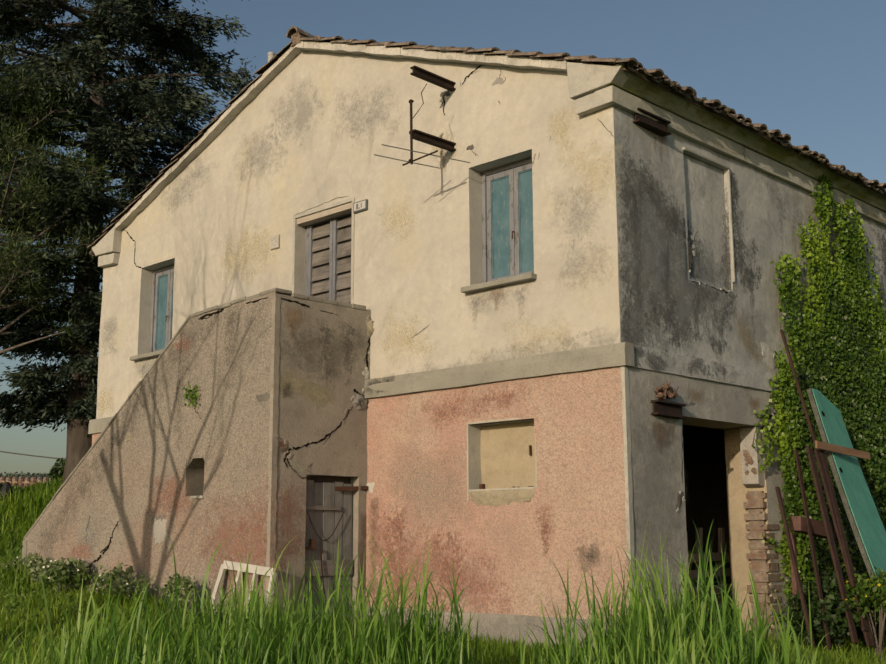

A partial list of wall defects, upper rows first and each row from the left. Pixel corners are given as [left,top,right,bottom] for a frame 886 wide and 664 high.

water stain [617,155,762,379]
crack [284,338,371,479]
crack [86,517,119,567]